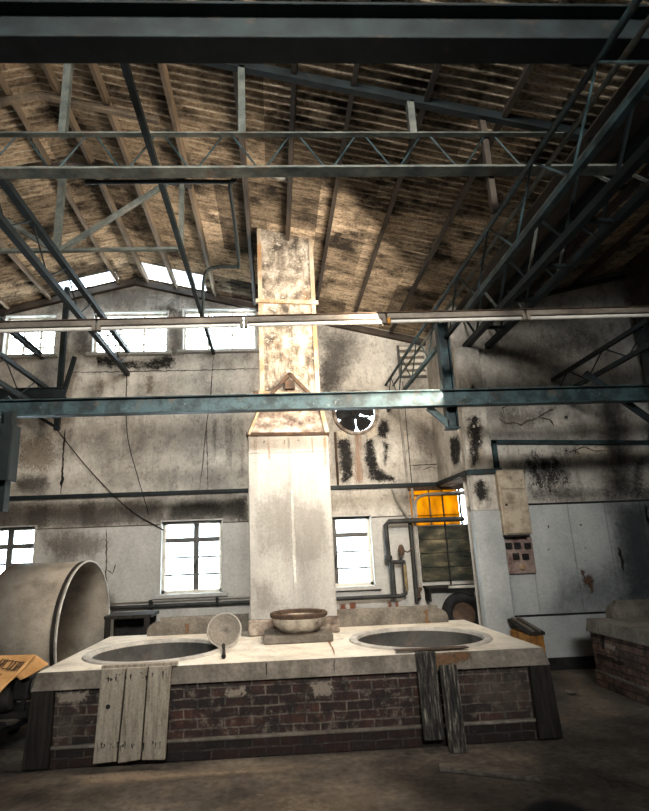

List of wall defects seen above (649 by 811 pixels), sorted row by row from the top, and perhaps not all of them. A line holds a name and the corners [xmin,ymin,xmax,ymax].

mould [74,331,90,353]
mould [96,329,182,370]
crack [499,406,554,426]
mould [337,438,354,482]
mould [364,418,401,484]
mould [474,479,491,501]
water stain [524,448,580,497]
corrosion [581,570,594,592]